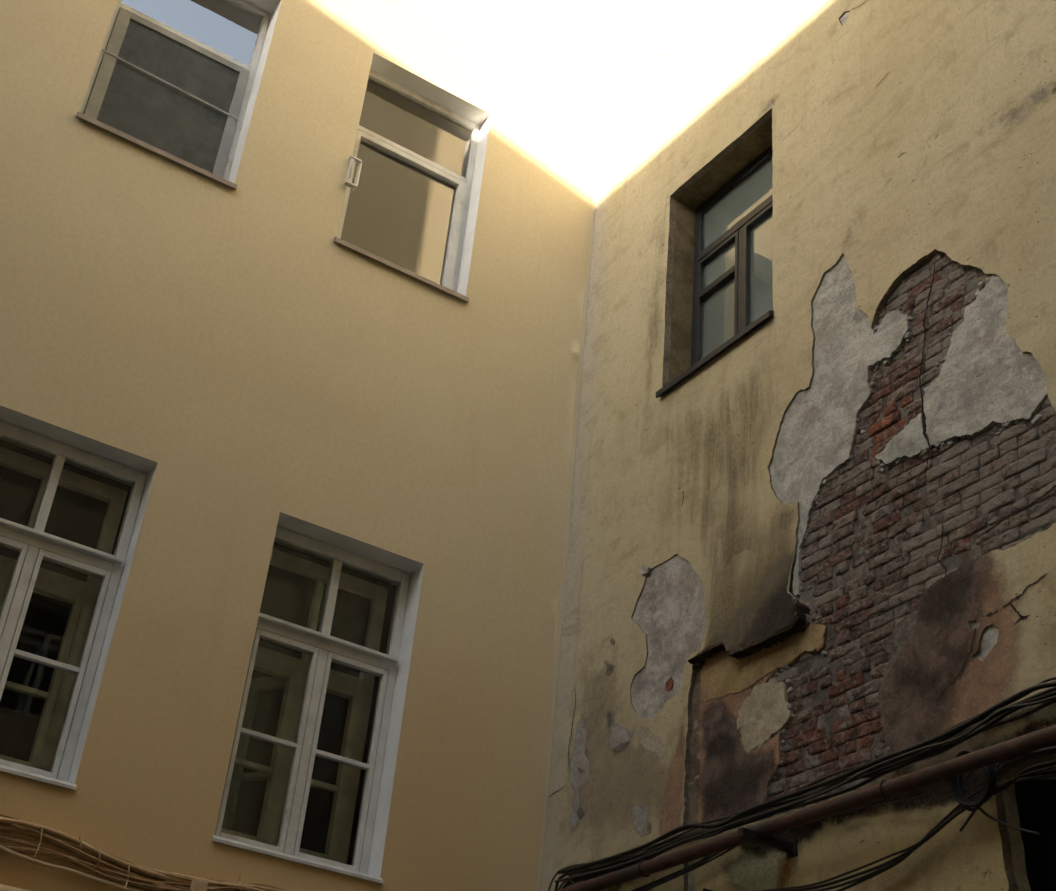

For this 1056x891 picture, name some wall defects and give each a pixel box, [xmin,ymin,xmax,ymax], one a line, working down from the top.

leakage [704,381,807,658]
flaking render [631,252,1056,830]
leakage [901,569,1019,741]
crack [934,573,1048,709]